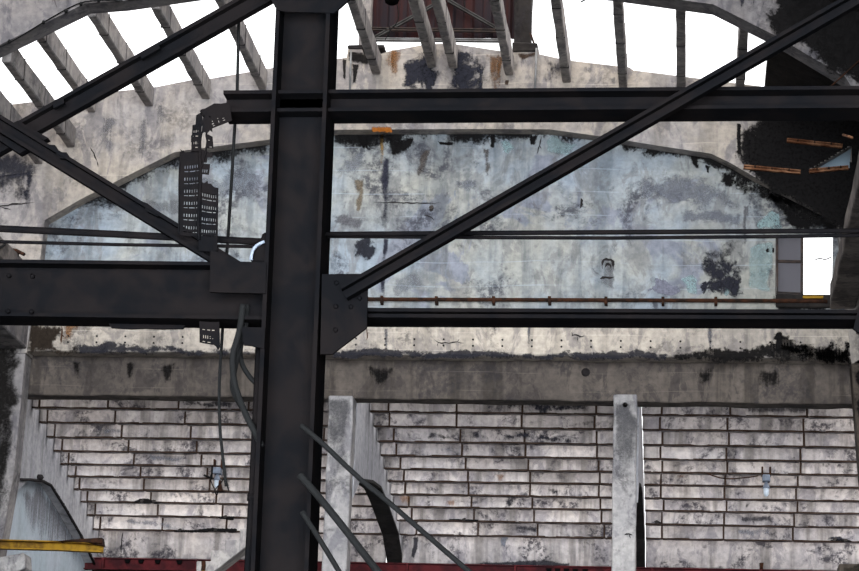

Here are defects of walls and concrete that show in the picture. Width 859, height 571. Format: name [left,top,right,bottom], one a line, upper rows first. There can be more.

damp [403,56,438,89]
damp [448,50,485,89]
damp [737,123,757,174]
damp [0,154,35,200]
damp [641,155,748,240]
damp [701,243,743,297]
damp [333,329,851,386]